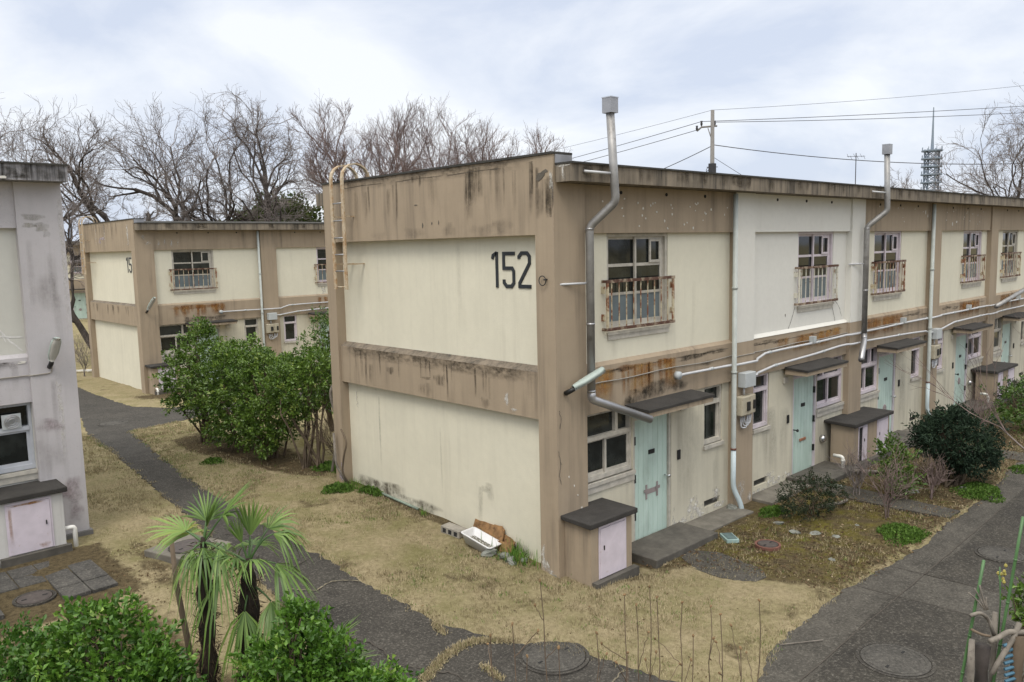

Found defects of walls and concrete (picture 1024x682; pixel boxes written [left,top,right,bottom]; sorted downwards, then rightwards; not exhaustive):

rust [596,358,674,395]